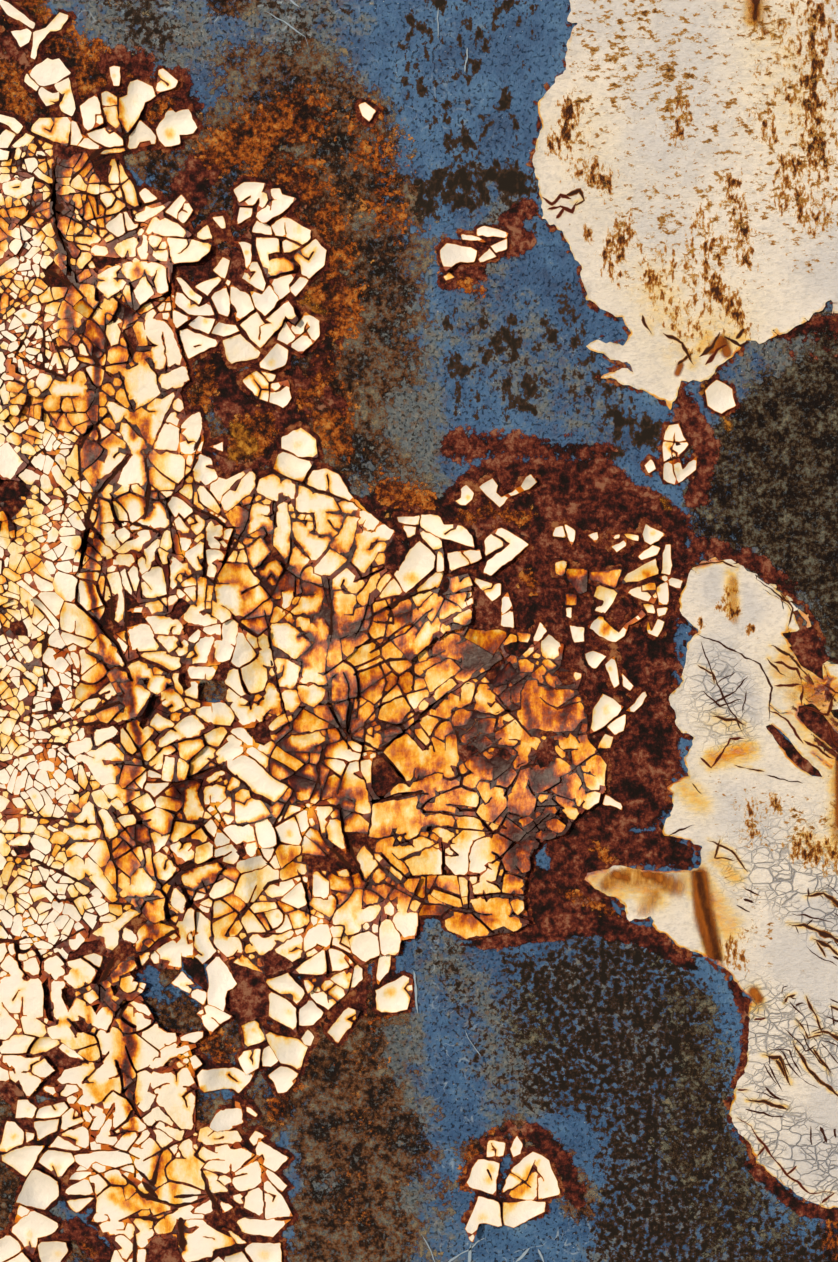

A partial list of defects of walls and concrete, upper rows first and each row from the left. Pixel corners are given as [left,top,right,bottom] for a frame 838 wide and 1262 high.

corrosion [544,0,731,153]
peeling [532,0,838,414]
peeling [644,424,697,485]
corrosion [107,606,284,825]
crack [0,140,544,1029]
peeling [0,0,647,1262]
crack [692,560,838,794]
corrosion [155,800,312,981]
peeling [555,524,838,1209]
corrosion [0,1000,164,1262]
crack [90,1068,221,1262]
crack [737,986,838,1203]